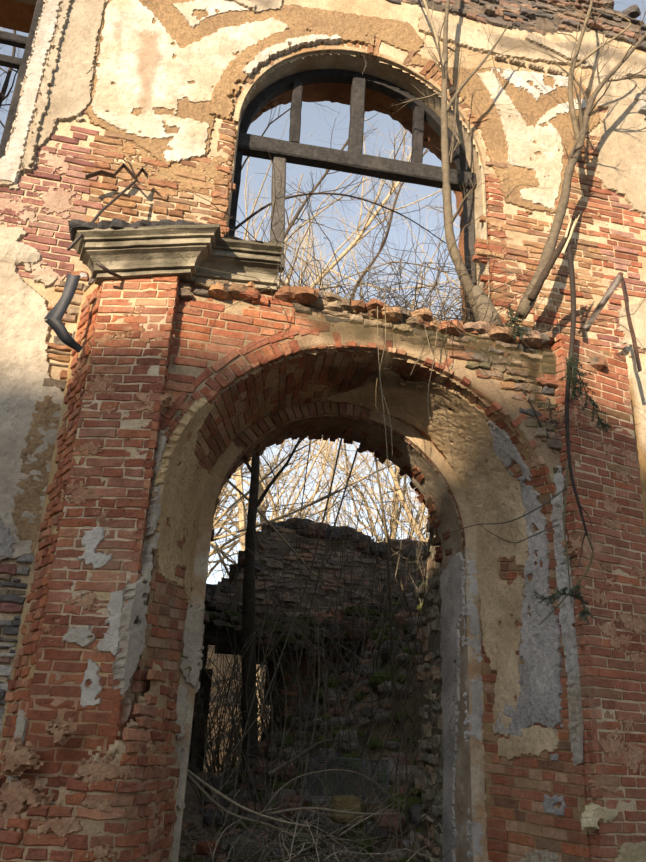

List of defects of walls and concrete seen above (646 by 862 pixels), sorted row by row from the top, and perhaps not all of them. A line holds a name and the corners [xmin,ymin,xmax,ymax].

peeling [37,815,83,840]
peeling [0,0,392,833]
peeling [327,358,646,862]
spalling [403,50,646,358]